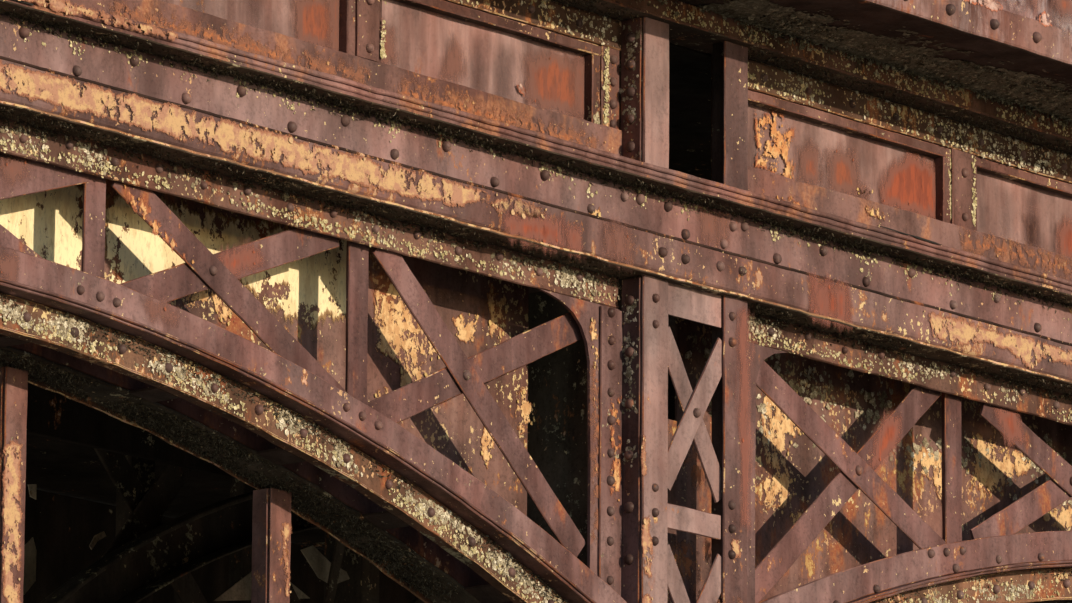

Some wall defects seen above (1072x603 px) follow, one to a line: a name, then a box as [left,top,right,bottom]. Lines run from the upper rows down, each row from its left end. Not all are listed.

peeling [18,0,178,41]
rust [398,40,606,149]
peeling [0,63,547,219]
peeling [753,110,796,179]
rust [826,149,936,219]
peeling [0,185,83,271]
rust [960,217,1072,277]
peeling [372,282,440,398]
peeling [452,292,508,346]
peeling [924,310,1072,369]
peeling [761,392,804,524]
peeling [1,436,23,603]